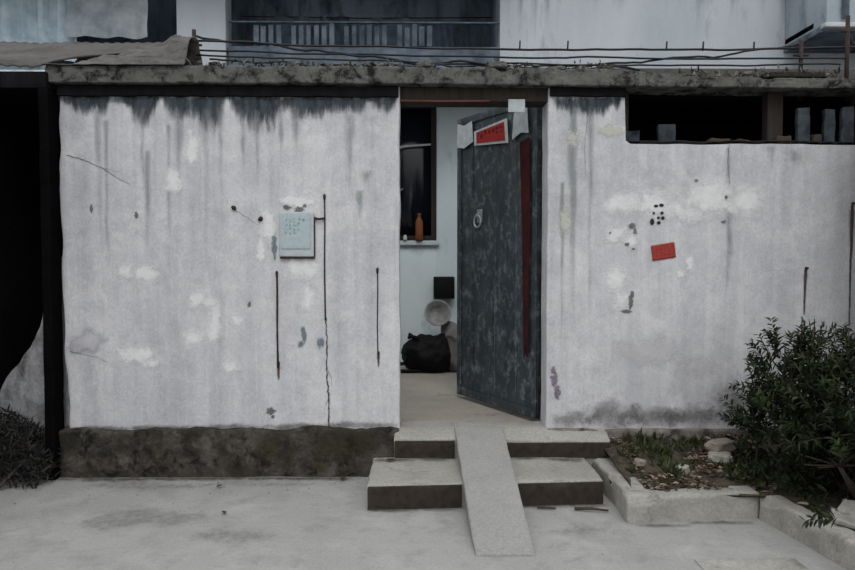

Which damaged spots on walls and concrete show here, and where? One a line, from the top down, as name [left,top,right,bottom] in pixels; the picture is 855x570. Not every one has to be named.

damp [63,96,396,125]
damp [555,97,620,133]
damp [561,144,575,213]
peeling [604,177,764,223]
peeling [606,223,638,250]
crack [324,318,332,426]